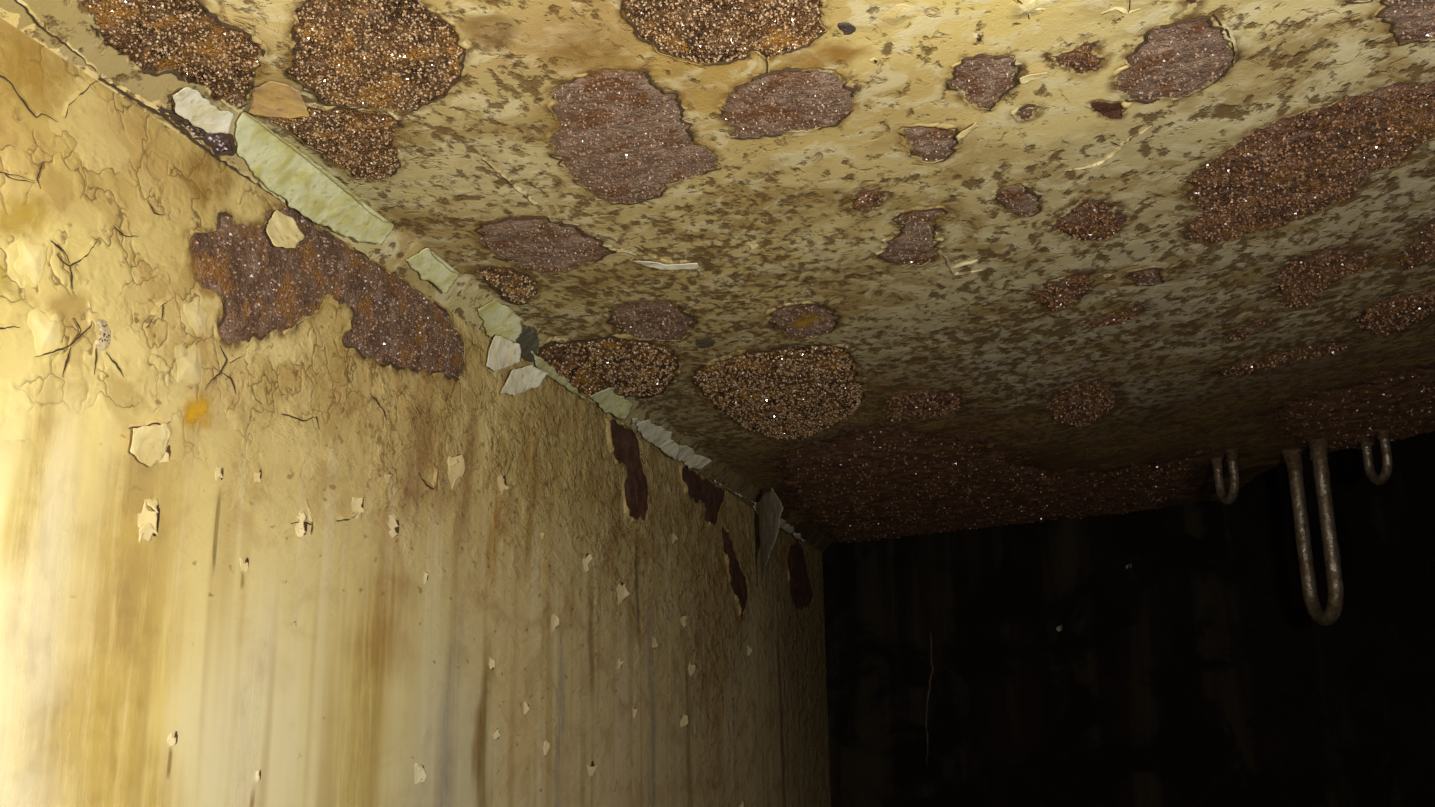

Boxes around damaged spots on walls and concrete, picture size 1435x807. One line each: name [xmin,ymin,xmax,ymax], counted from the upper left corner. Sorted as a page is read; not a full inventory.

crack [0,0,284,202]
peeling [173,81,394,248]
corrosion [80,0,509,181]
corrosion [618,0,859,140]
corrosion [1179,78,1435,244]
crack [0,199,164,378]
crack [127,418,171,429]
peeling [130,423,171,467]
crack [204,345,243,394]
corrosion [186,202,466,385]
peeling [406,248,461,294]
peeling [478,300,807,586]